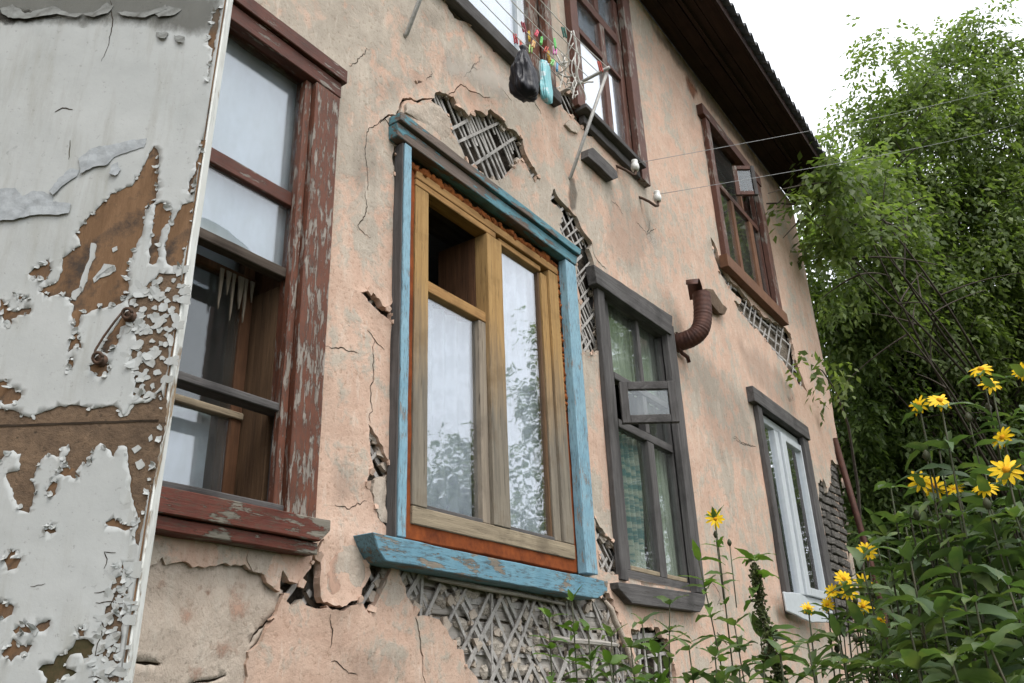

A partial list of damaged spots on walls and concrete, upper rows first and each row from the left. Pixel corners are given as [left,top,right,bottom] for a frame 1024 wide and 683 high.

crack [358,55,482,238]
flaking render [404,94,541,182]
peeling [0,138,206,546]
crack [329,330,385,423]
flaking render [550,195,598,355]
flaking render [712,246,802,386]
flaking render [365,432,390,526]
peeling [0,599,51,661]
flaking render [71,549,313,683]
crack [302,573,364,674]
flaking render [351,560,675,683]
flaking render [818,462,854,637]